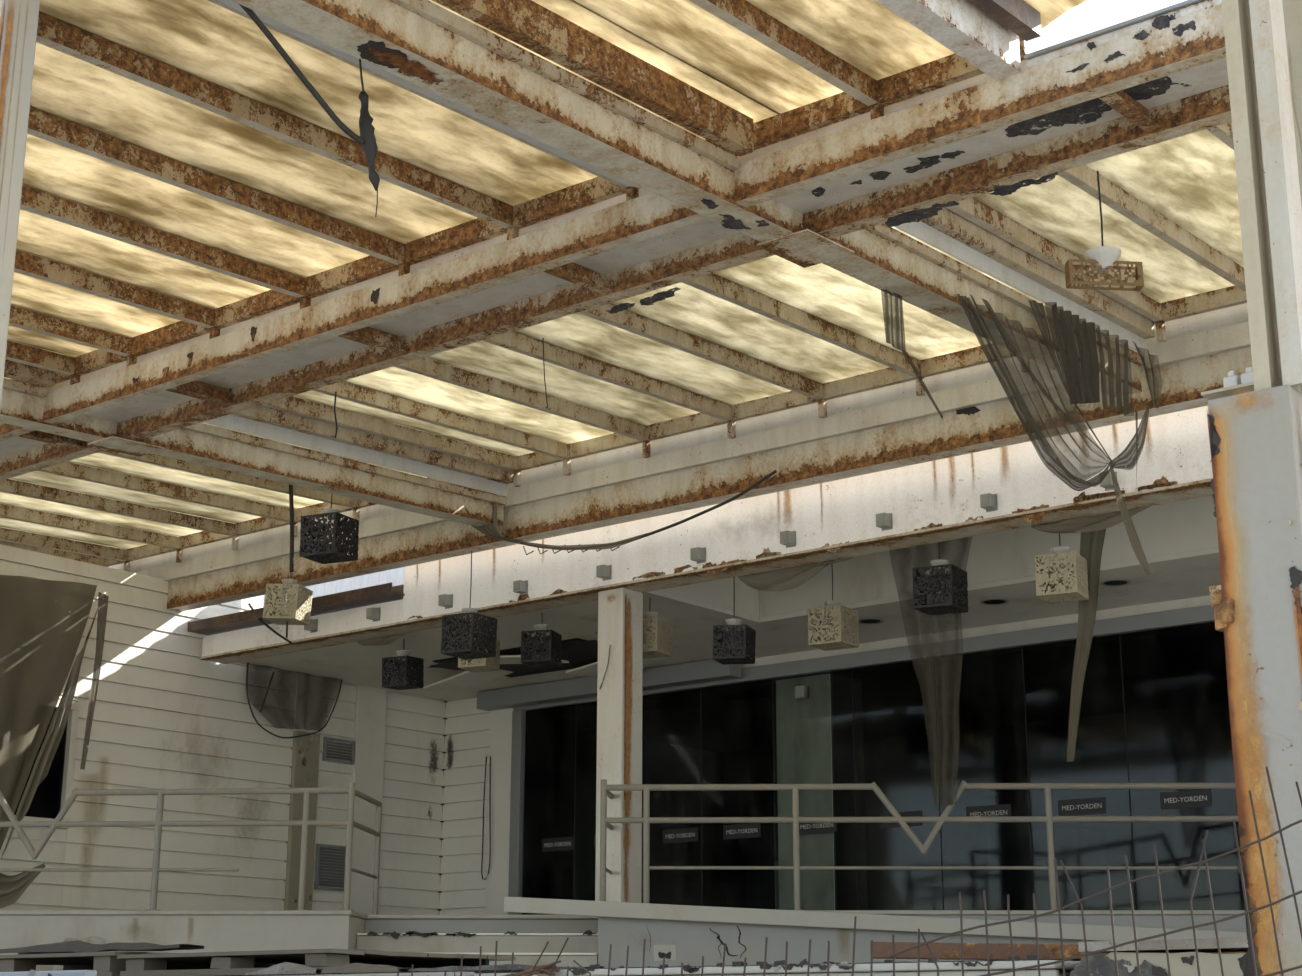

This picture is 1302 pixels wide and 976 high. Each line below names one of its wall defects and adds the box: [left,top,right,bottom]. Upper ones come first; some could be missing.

rust [0,5,13,148]
rust [357,40,444,85]
peeling [1123,76,1192,100]
peeling [1005,98,1113,138]
peeling [701,198,769,230]
rust [955,406,981,415]
rust [1289,566,1302,679]
spalling [27,965,63,976]
flaking render [1070,952,1167,976]